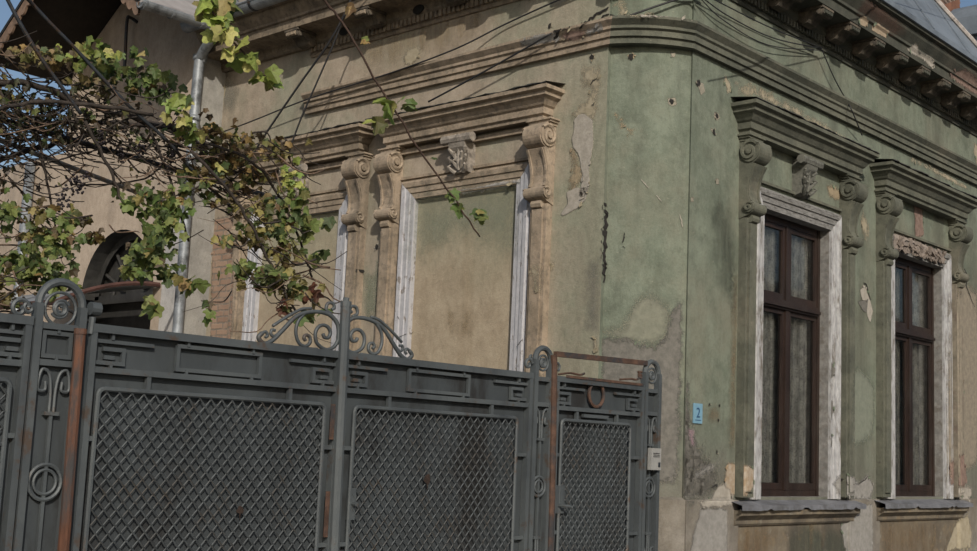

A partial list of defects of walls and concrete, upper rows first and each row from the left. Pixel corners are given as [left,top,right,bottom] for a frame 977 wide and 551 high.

peeling [561,114,594,216]
crack [601,203,625,283]
peeling [860,285,873,322]
flaking render [601,304,755,509]